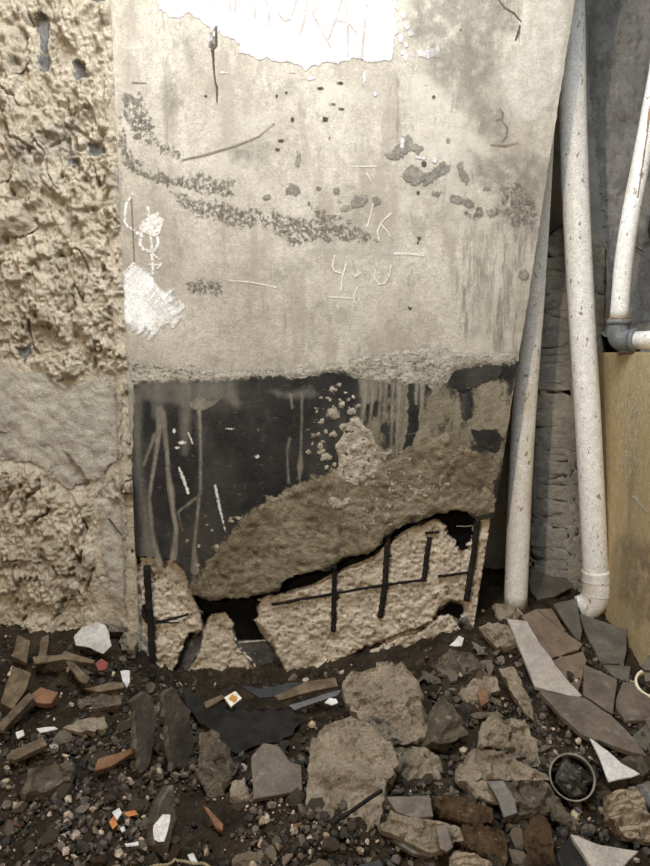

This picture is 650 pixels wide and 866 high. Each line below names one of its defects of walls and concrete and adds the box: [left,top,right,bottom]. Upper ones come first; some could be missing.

leakage [464,182,537,229]
spalling [127,344,518,385]
leakage [143,411,197,561]
leakage [306,379,455,532]
spalling [142,565,189,665]
spalling [272,531,439,632]
spalling [438,520,480,602]